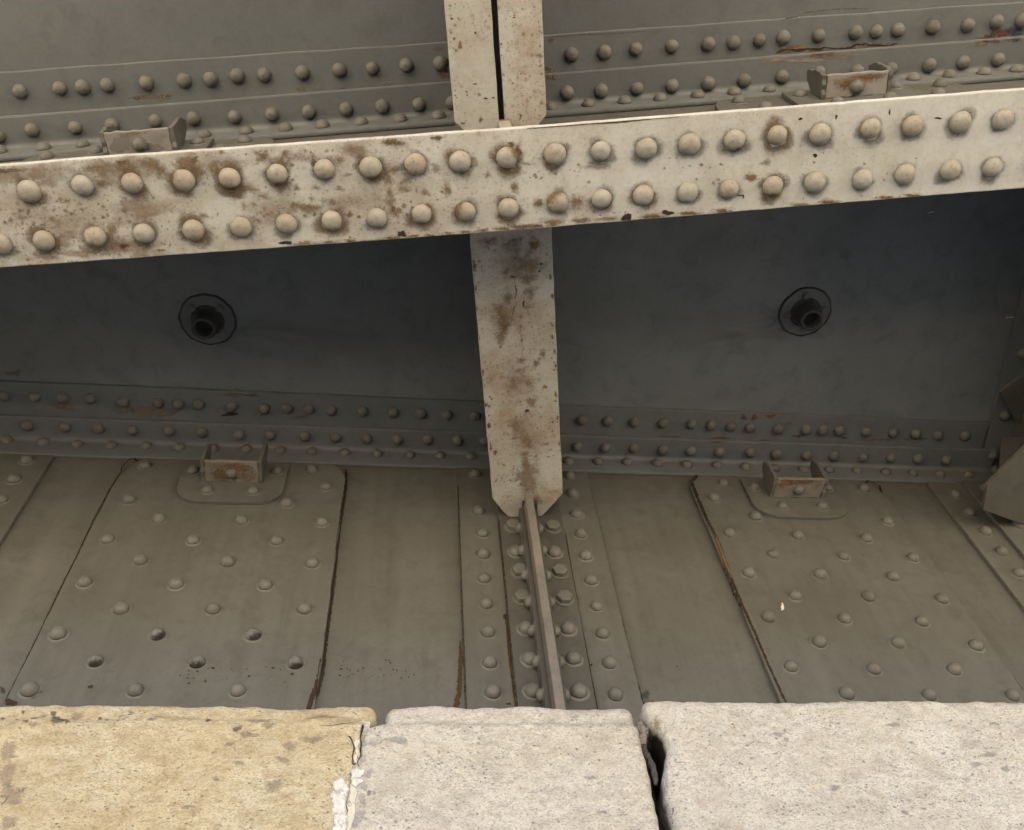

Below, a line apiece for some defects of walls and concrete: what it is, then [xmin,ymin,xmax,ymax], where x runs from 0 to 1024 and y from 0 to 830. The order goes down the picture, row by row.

corrosion [836,74,885,90]
corrosion [977,28,1022,46]
corrosion [0,132,371,259]
corrosion [573,183,698,223]
corrosion [746,117,792,204]
corrosion [326,142,568,503]
corrosion [453,486,467,709]
corrosion [690,475,787,703]